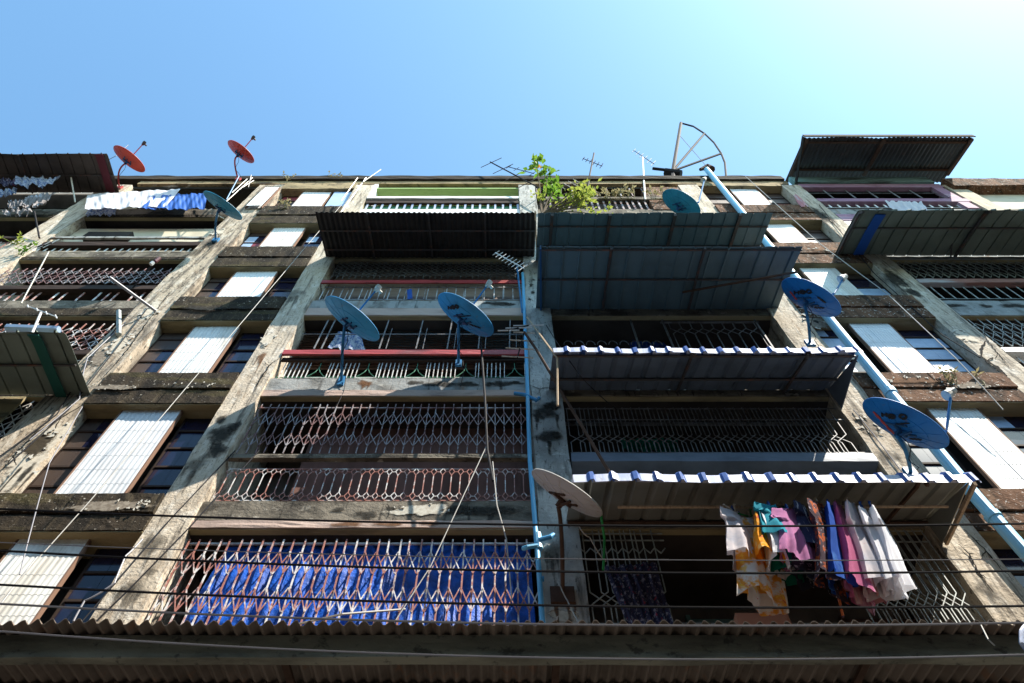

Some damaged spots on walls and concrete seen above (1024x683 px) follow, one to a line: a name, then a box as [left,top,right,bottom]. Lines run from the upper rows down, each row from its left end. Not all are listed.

damp [206,415,242,457]
damp [532,401,563,455]